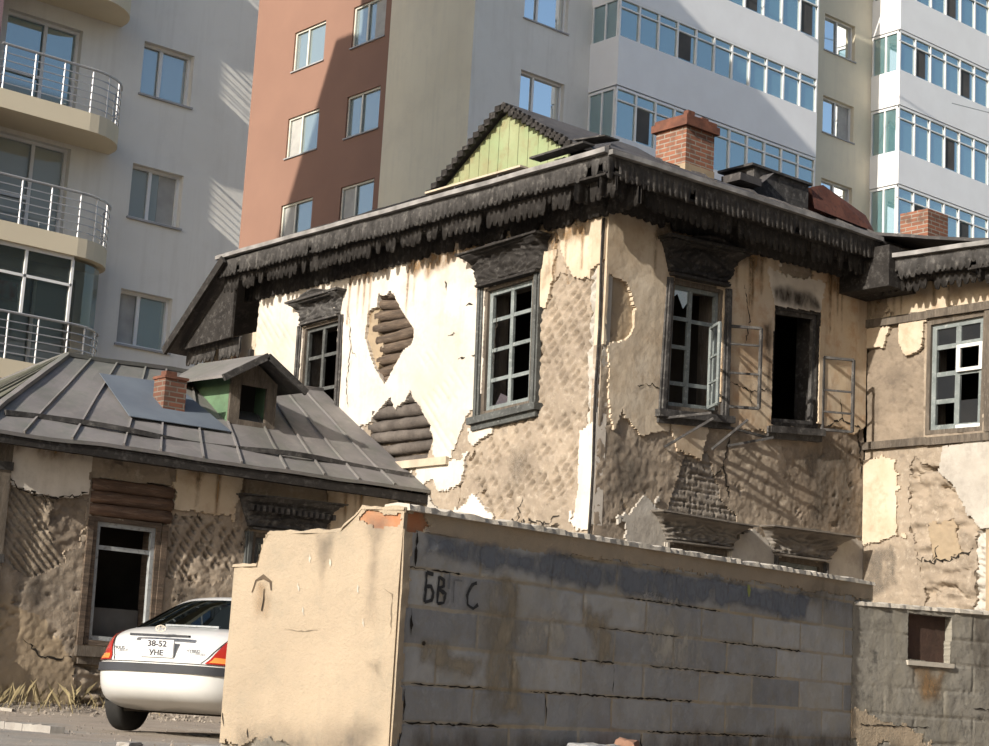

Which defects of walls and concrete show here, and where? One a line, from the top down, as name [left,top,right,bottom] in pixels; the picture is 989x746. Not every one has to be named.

flaking render [255,243,496,533]
flaking render [535,213,736,546]
flaking render [716,254,989,435]
flaking render [825,440,989,611]
crack [917,546,973,565]
crack [23,639,72,661]